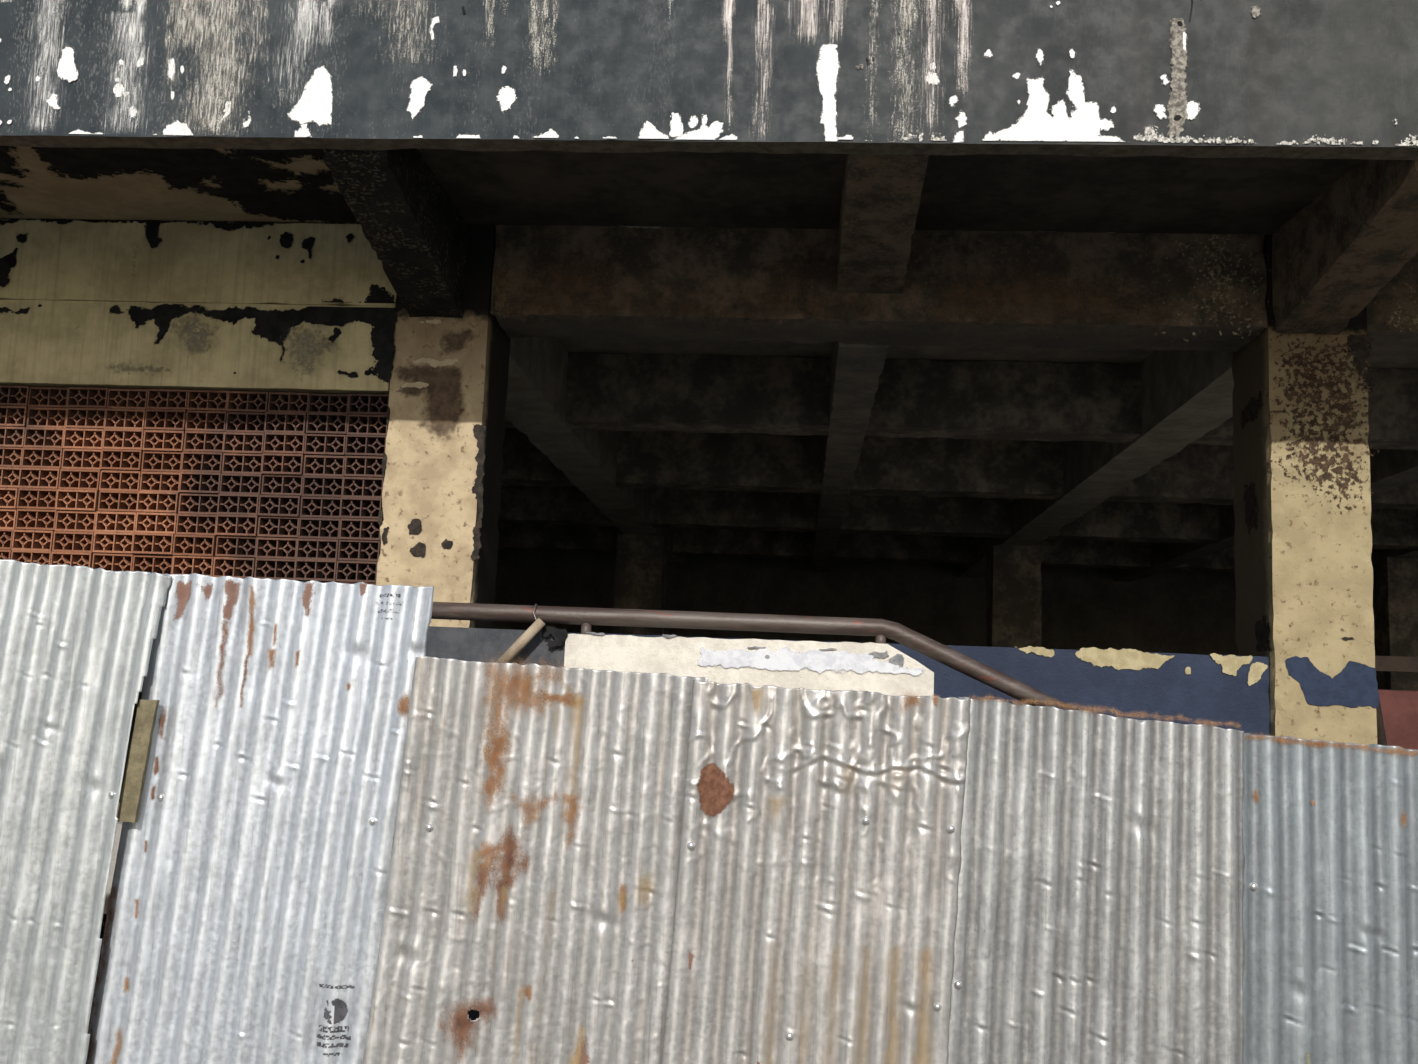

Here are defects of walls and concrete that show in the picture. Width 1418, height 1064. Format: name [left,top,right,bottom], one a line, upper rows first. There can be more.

peeling [0,57,359,263]
peeling [638,112,737,140]
water stain [723,0,735,122]
water stain [789,0,843,41]
peeling [816,44,875,141]
water stain [866,0,970,136]
peeling [982,18,1256,144]
water stain [398,330,472,438]
corrosion [174,579,277,706]
corrosion [473,665,582,918]
corrosion [697,763,734,816]
corrosion [87,887,116,1060]